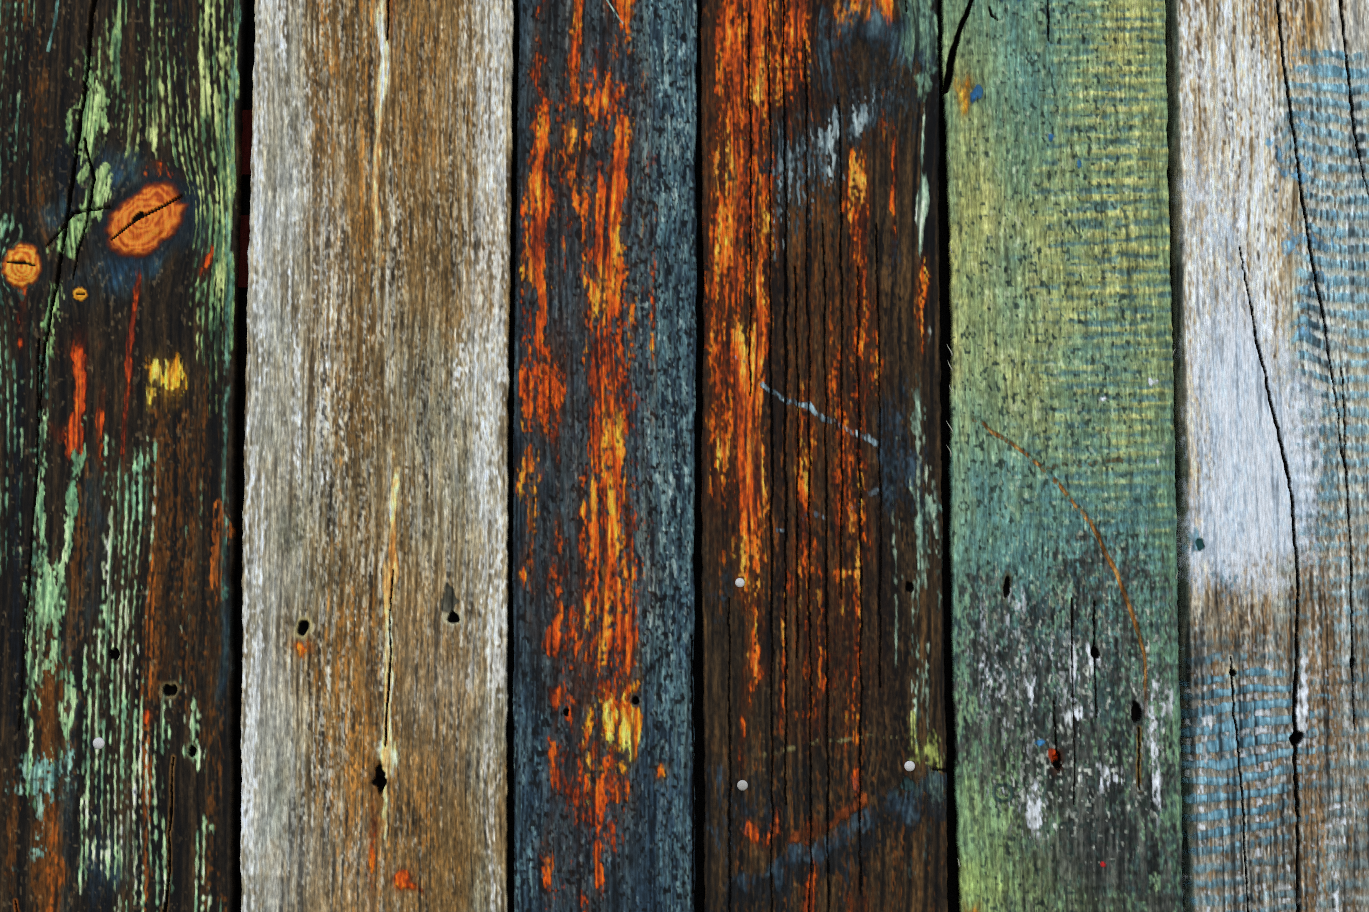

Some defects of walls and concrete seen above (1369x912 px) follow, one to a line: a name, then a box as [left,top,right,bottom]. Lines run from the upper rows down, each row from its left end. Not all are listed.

peeling [0,0,241,912]
peeling [517,0,656,912]
peeling [744,768,868,912]
peeling [704,0,942,744]
peeling [895,626,941,769]
crack [943,0,973,95]
peeling [979,588,1335,912]
crack [1239,247,1299,912]
crack [1276,0,1355,730]
peeling [1266,50,1369,561]
crack [1339,0,1368,194]